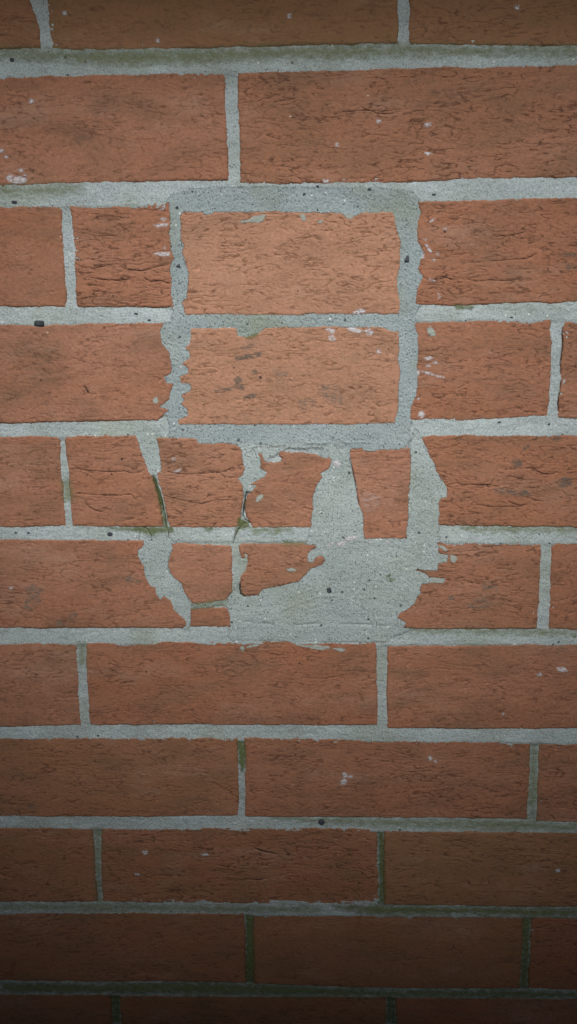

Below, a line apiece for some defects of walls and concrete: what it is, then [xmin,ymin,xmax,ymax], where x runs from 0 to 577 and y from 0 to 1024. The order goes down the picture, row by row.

crack [77,468,233,538]